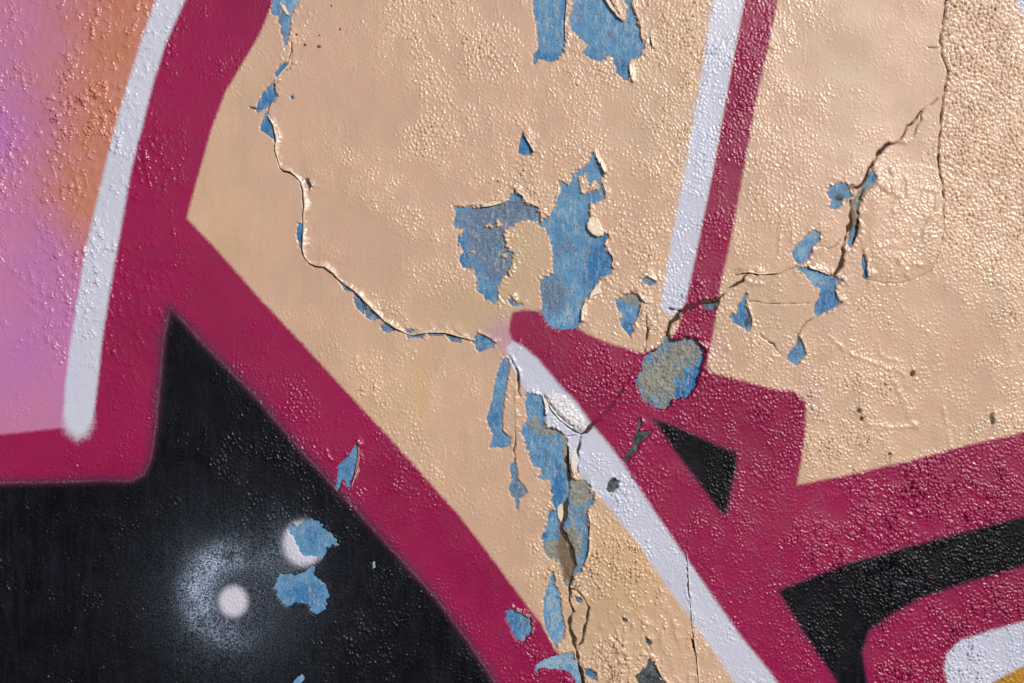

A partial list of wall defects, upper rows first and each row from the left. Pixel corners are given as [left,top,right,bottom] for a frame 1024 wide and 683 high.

peeling [532,0,655,82]
crack [821,0,948,276]
crack [250,42,476,343]
peeling [453,146,614,331]
peeling [616,273,658,336]
crack [644,265,816,352]
peeling [792,230,842,316]
flaking render [635,335,705,409]
peeling [336,443,362,489]
peeling [273,518,339,614]
peeling [486,358,619,683]
crack [546,376,630,683]